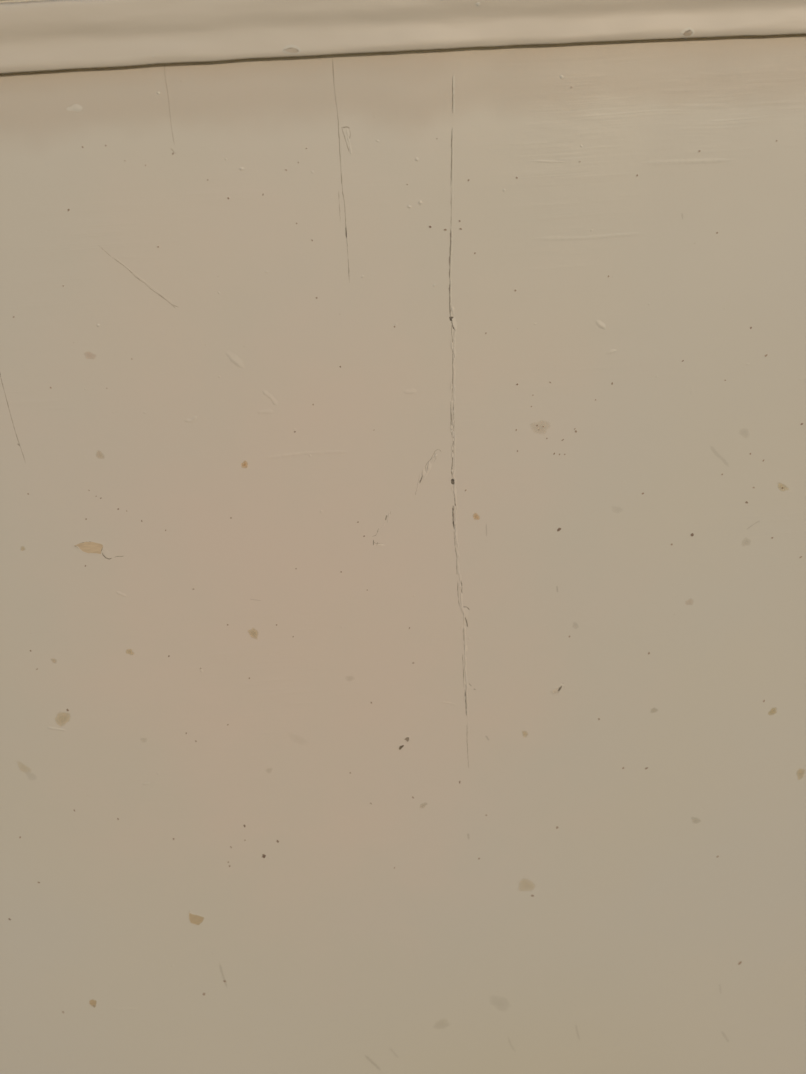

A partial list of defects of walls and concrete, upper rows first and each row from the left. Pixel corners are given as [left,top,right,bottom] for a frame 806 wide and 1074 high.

crack [449,75,476,767]